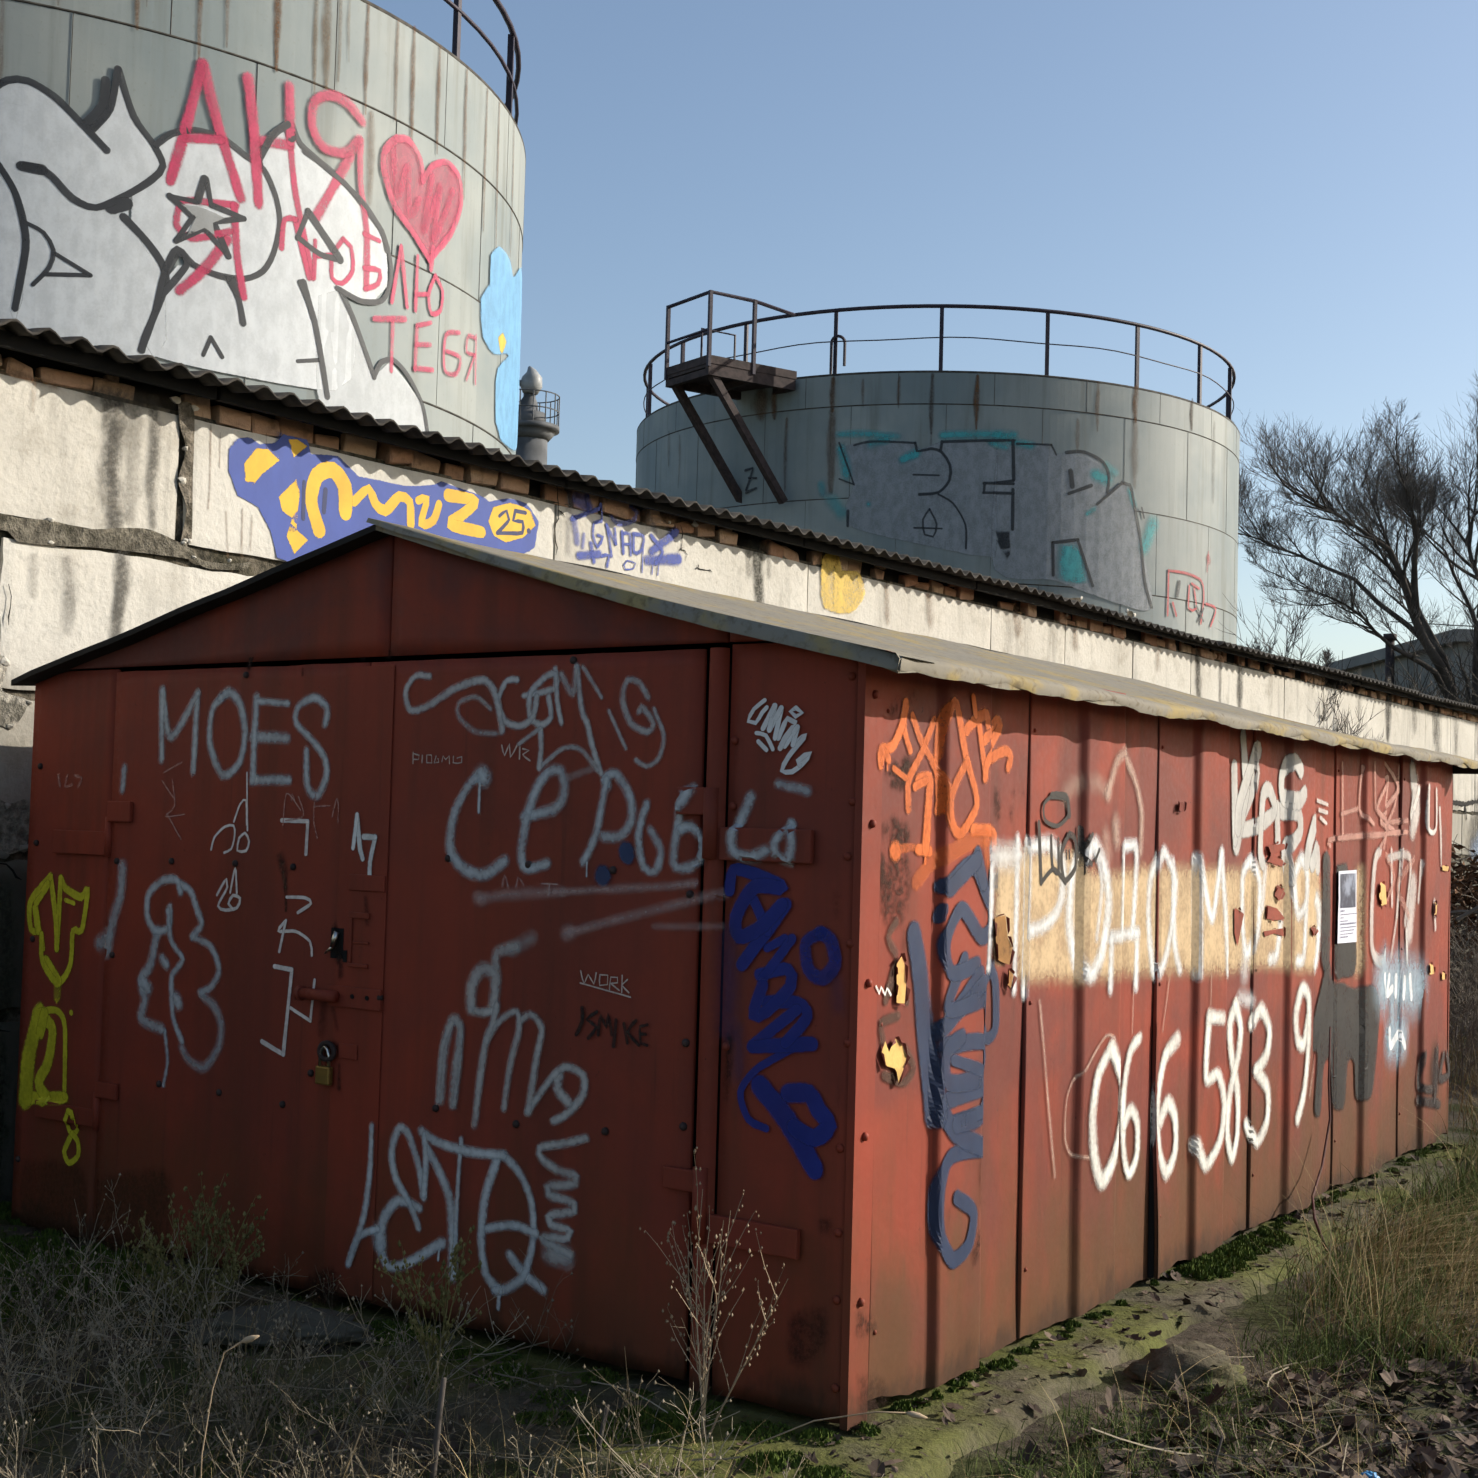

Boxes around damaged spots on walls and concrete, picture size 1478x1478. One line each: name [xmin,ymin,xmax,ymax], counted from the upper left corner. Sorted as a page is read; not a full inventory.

corrosion [395,26,416,138]
water stain [92,388,170,528]
water stain [112,551,128,637]
spalling [0,654,33,730]
corrosion [890,758,913,788]
spalling [0,799,30,859]
corrosion [880,819,910,918]